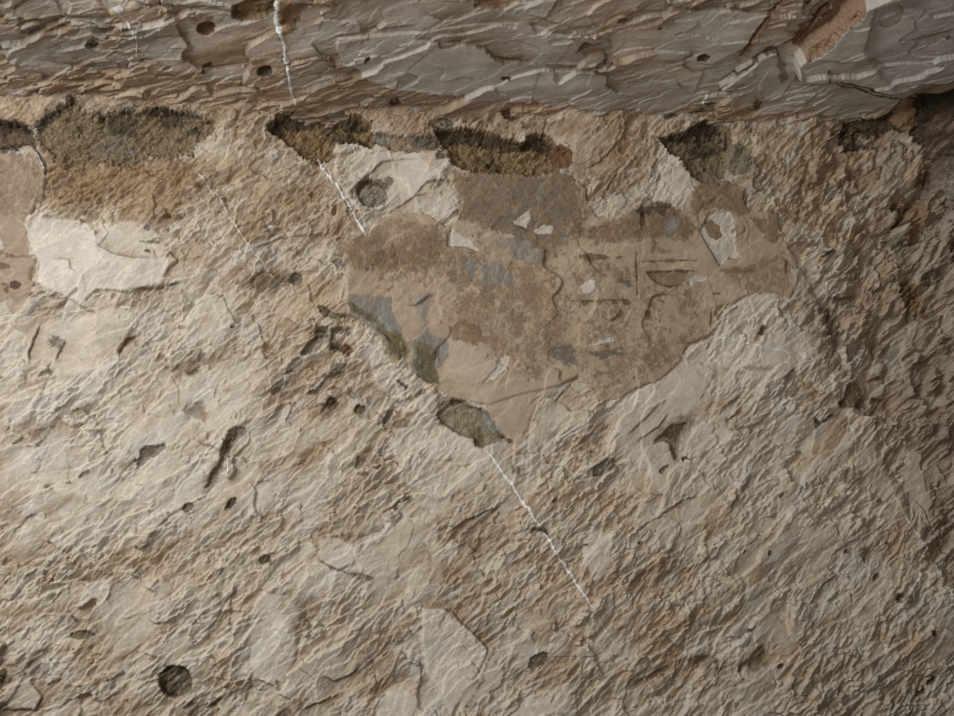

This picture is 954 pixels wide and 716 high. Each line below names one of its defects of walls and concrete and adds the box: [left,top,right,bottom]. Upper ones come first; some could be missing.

water stain [452,136,782,262]
water stain [348,294,449,383]
water stain [471,414,495,448]
crack [321,561,373,580]